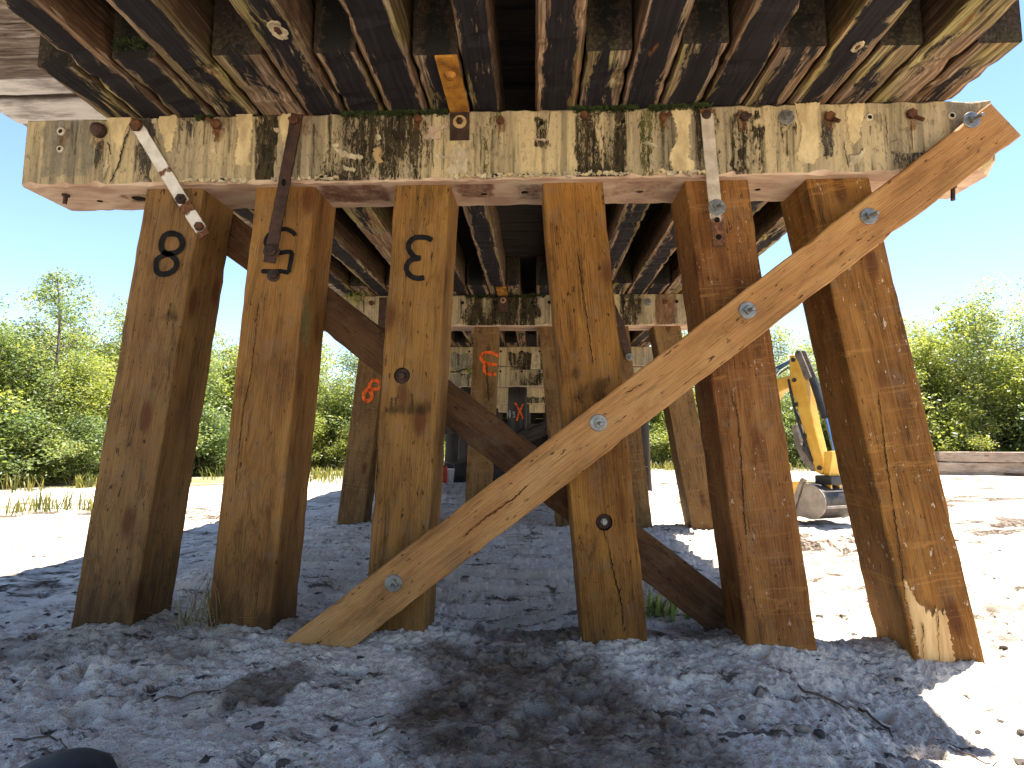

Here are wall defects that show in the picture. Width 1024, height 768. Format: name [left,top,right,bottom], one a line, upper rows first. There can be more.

peeling [103,117,132,180]
peeling [152,115,178,152]
peeling [273,113,301,148]
damp [313,113,434,181]
damp [473,112,502,175]
damp [534,113,551,149]
damp [574,109,670,177]
peeling [652,106,706,177]
peeling [794,102,820,165]
crack [734,401,747,535]
crack [878,394,904,581]
crack [602,519,624,626]